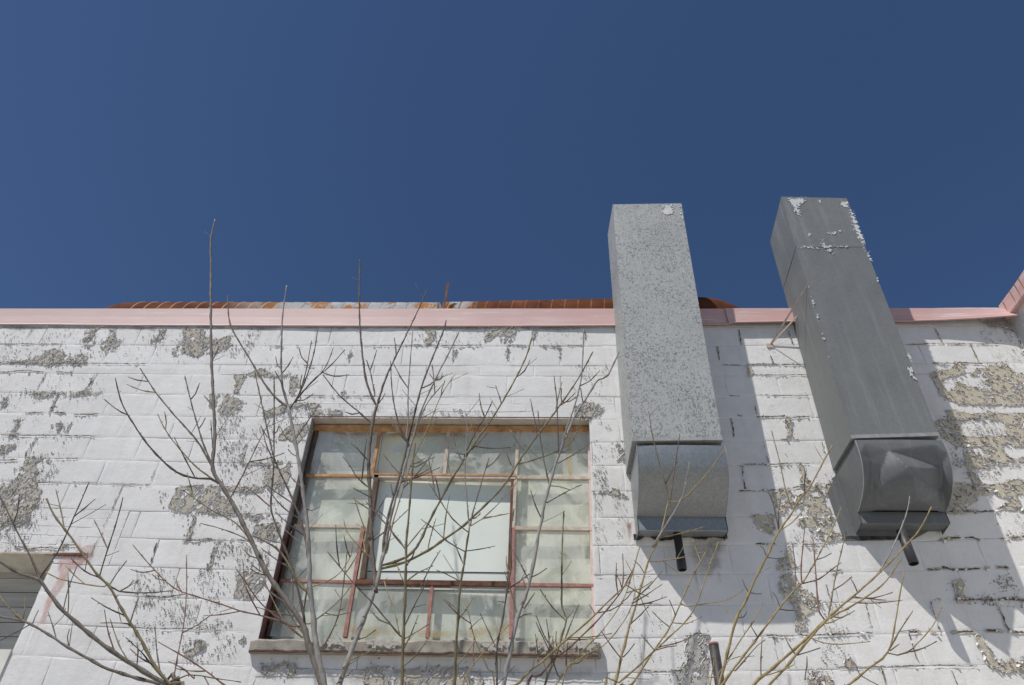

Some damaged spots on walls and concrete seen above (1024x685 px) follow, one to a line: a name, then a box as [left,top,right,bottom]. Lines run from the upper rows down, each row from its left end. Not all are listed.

peeling [0,326,122,369]
peeling [142,327,237,358]
peeling [163,368,347,542]
peeling [574,400,604,426]
peeling [928,361,1024,515]
peeling [0,452,55,536]
peeling [751,462,843,543]
peeling [774,546,823,632]
peeling [946,578,968,604]
spalling [670,628,710,685]
peeling [975,634,1024,678]